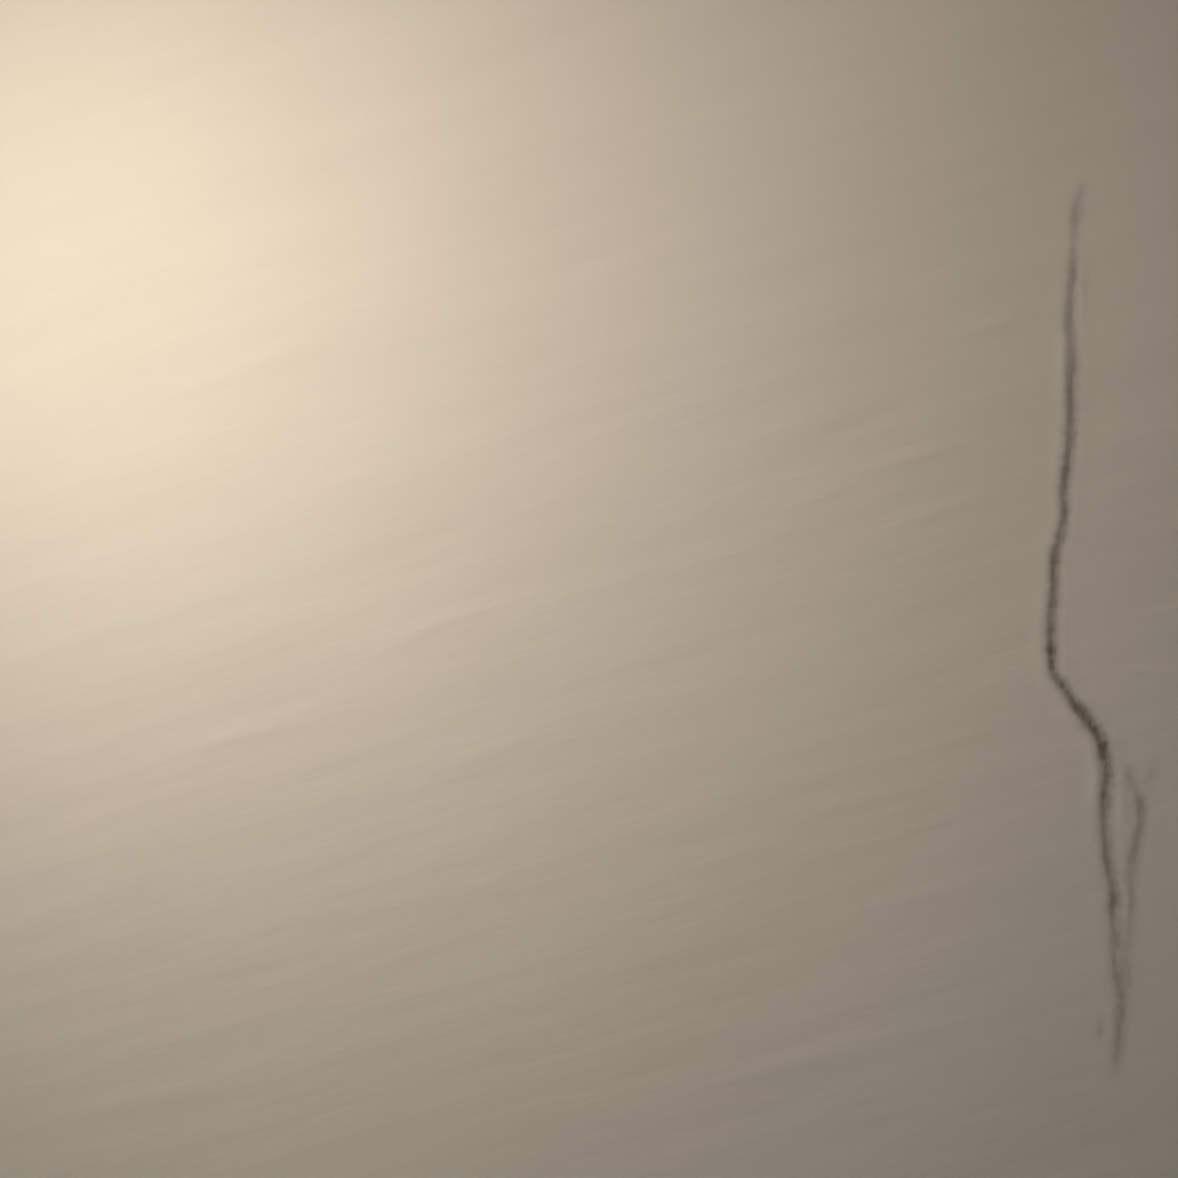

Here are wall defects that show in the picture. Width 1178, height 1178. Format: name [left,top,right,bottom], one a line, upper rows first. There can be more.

crack [1074,703,1107,758]